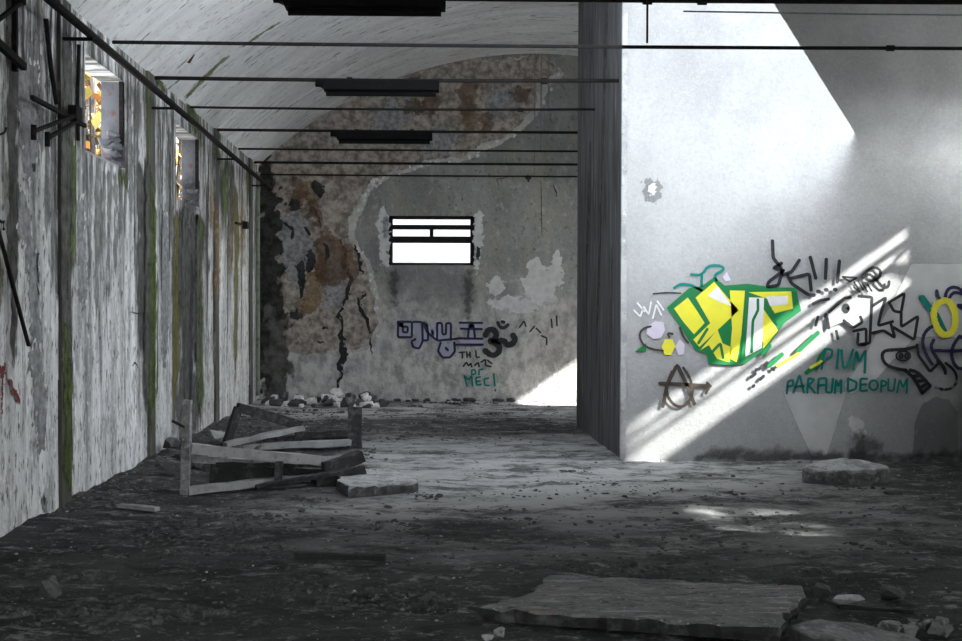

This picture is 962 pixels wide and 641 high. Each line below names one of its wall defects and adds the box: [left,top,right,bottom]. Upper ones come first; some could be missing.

crack [283,201,373,388]
peeling [258,54,568,355]